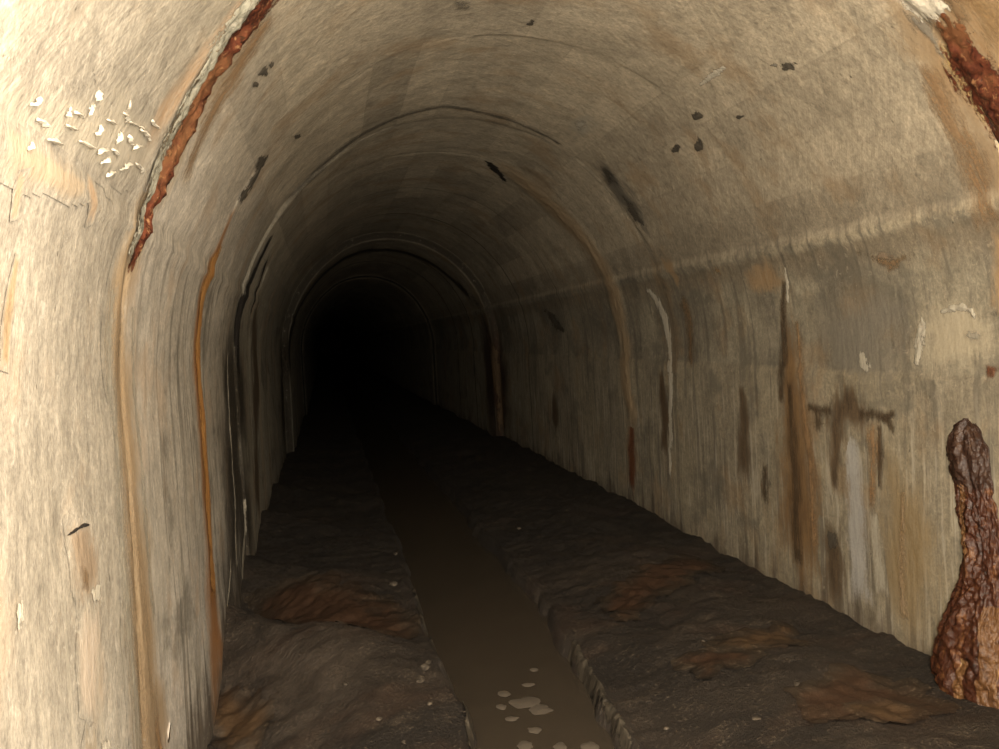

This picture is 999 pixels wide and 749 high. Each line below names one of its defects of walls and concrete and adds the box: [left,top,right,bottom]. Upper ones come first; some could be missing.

rust [863,0,999,223]
rust [101,0,283,749]
leakage [803,278,938,613]